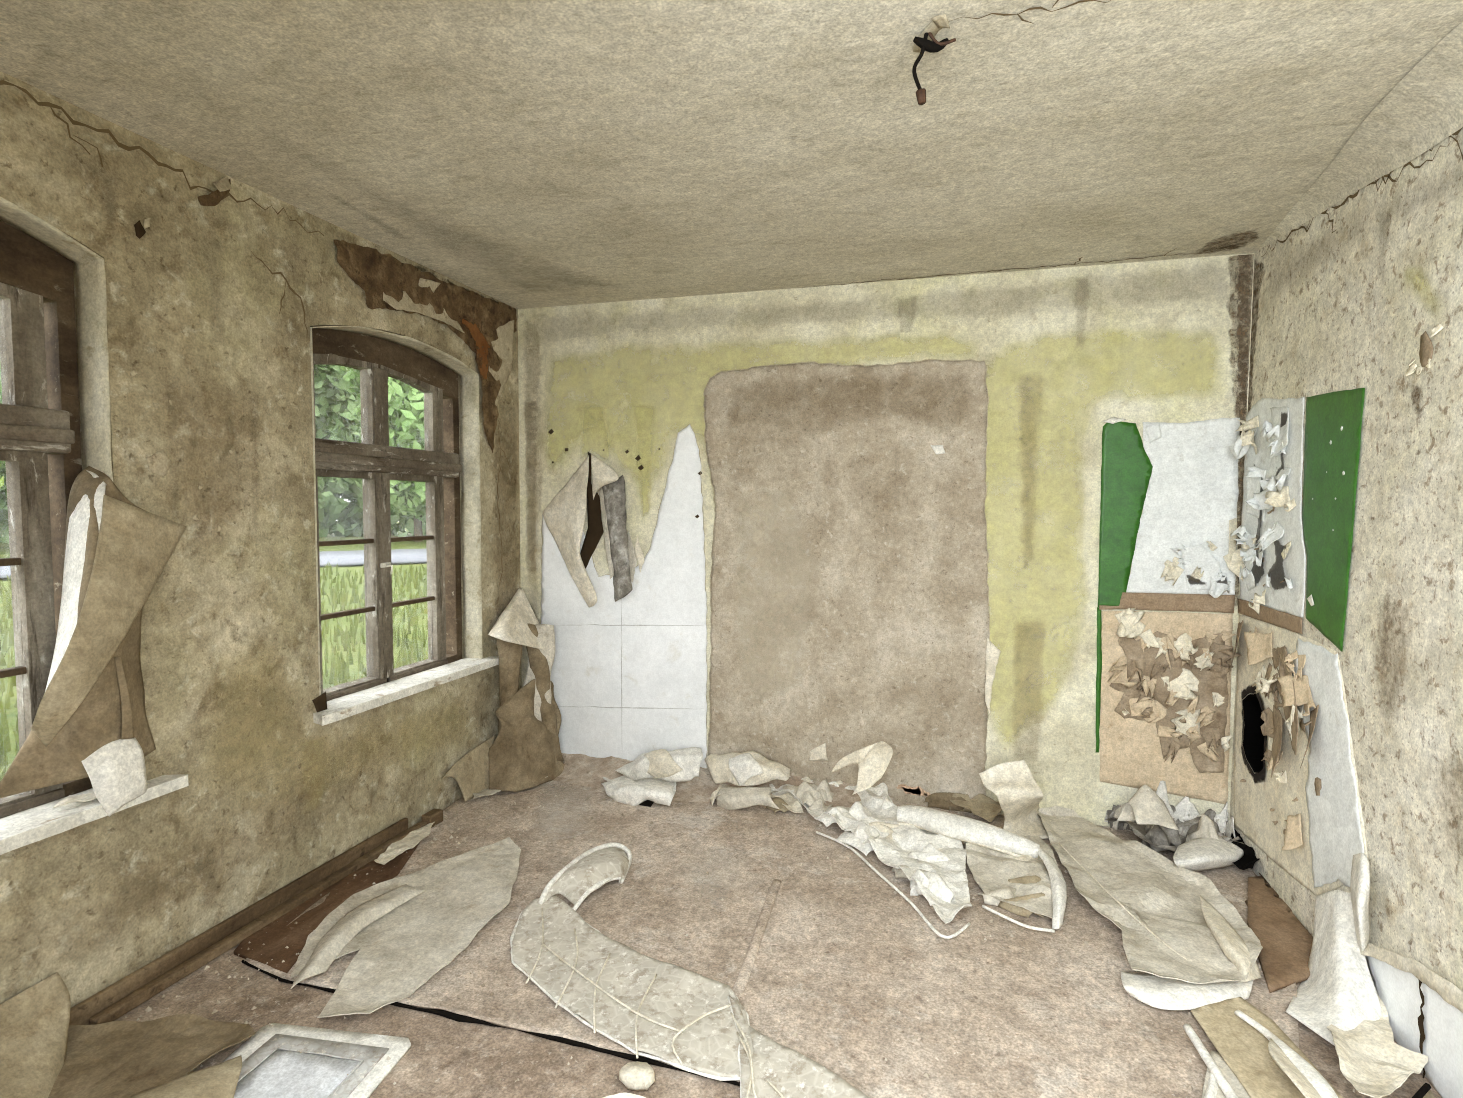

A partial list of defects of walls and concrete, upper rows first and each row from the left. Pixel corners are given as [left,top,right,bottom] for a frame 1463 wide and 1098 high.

crack [0,80,324,236]
crack [1261,127,1463,257]
crack [251,251,308,338]
flaking render [334,240,517,453]
water stain [1199,232,1264,435]
water stain [1236,456,1244,548]
peeling [1096,388,1370,951]